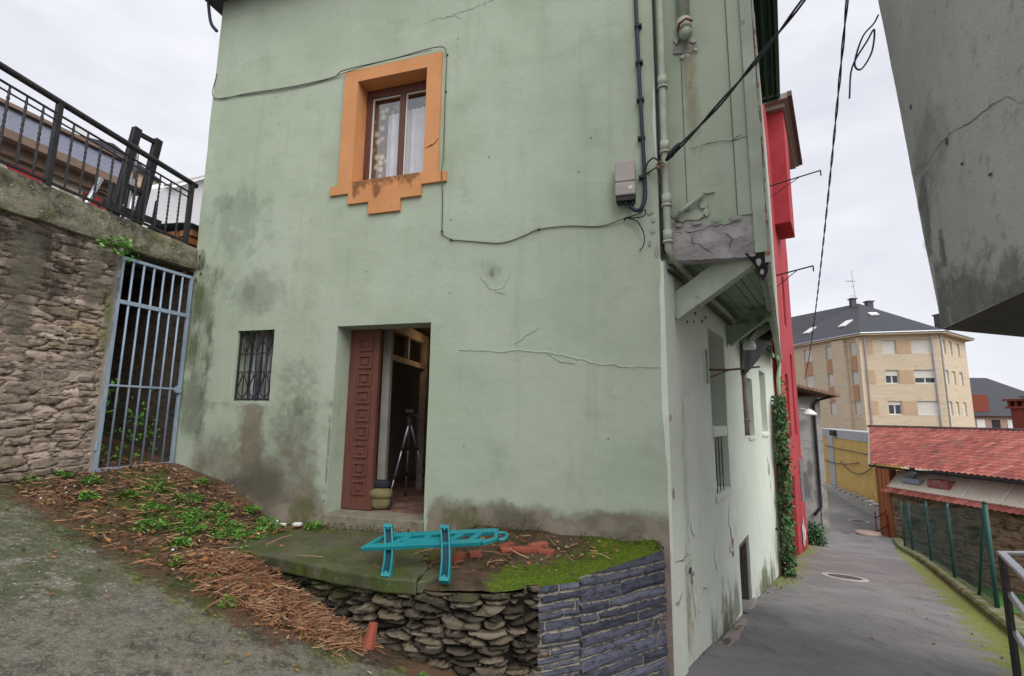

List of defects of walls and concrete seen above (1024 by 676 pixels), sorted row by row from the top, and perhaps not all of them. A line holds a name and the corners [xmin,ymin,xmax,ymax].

crack [912,96,1022,184]
spalling [647,190,770,281]
water stain [918,177,930,254]
water stain [193,404,315,523]
water stain [427,500,670,554]